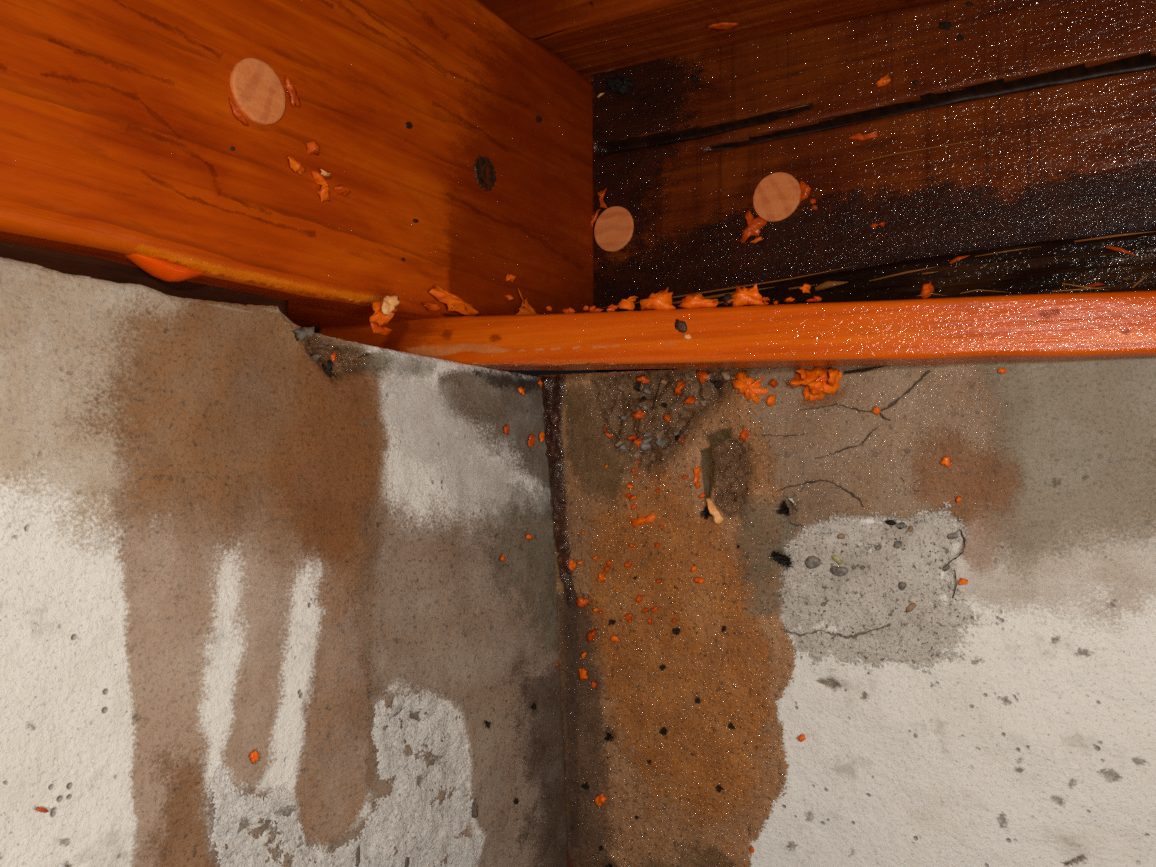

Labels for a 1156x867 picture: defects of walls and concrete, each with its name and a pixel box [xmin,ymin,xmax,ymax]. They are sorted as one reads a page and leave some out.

water stain [0,257,579,867]
rust [537,368,797,867]
crack [781,623,891,639]
crack [762,370,930,526]
spalling [776,501,1003,691]
water stain [734,357,1156,592]
crack [946,529,966,598]